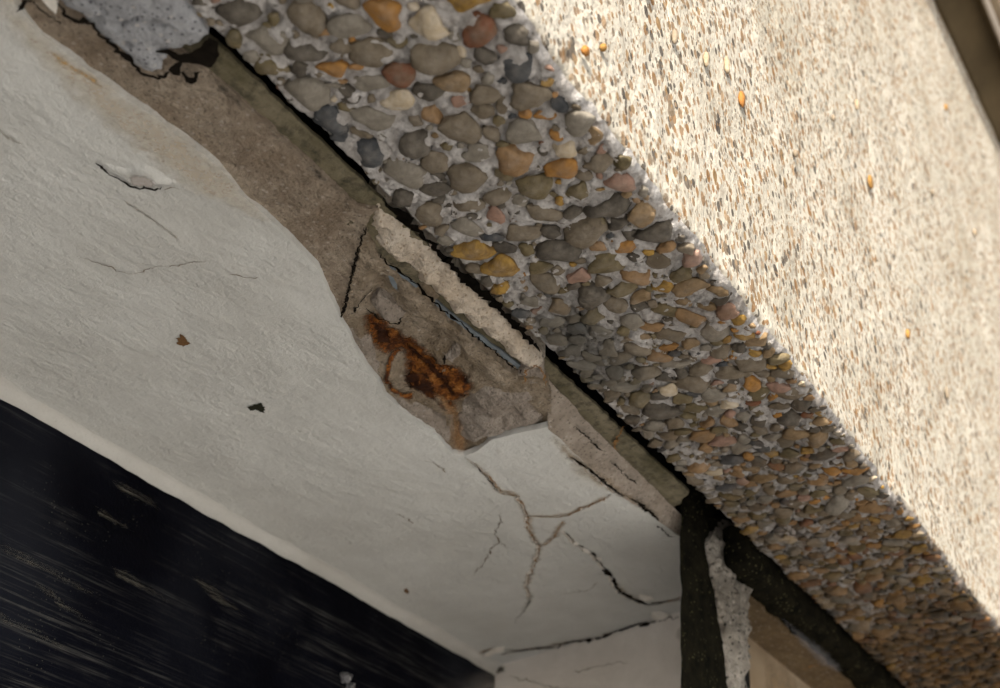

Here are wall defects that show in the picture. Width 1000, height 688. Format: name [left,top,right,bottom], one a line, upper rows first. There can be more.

peeling [21,0,552,450]
corrosion [364,313,473,414]
crack [466,427,681,688]